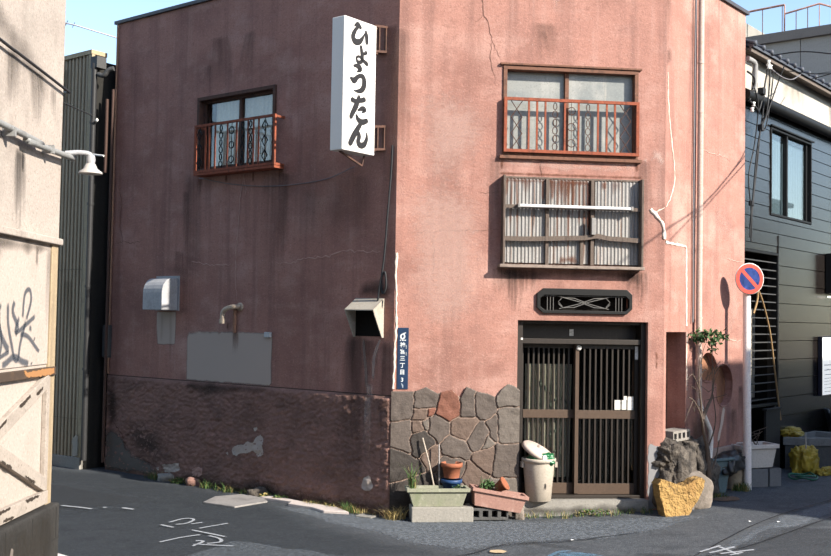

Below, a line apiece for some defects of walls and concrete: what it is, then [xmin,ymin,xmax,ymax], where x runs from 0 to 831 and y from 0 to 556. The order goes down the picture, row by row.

rust [501,162,589,261]
peeling [226,427,263,457]